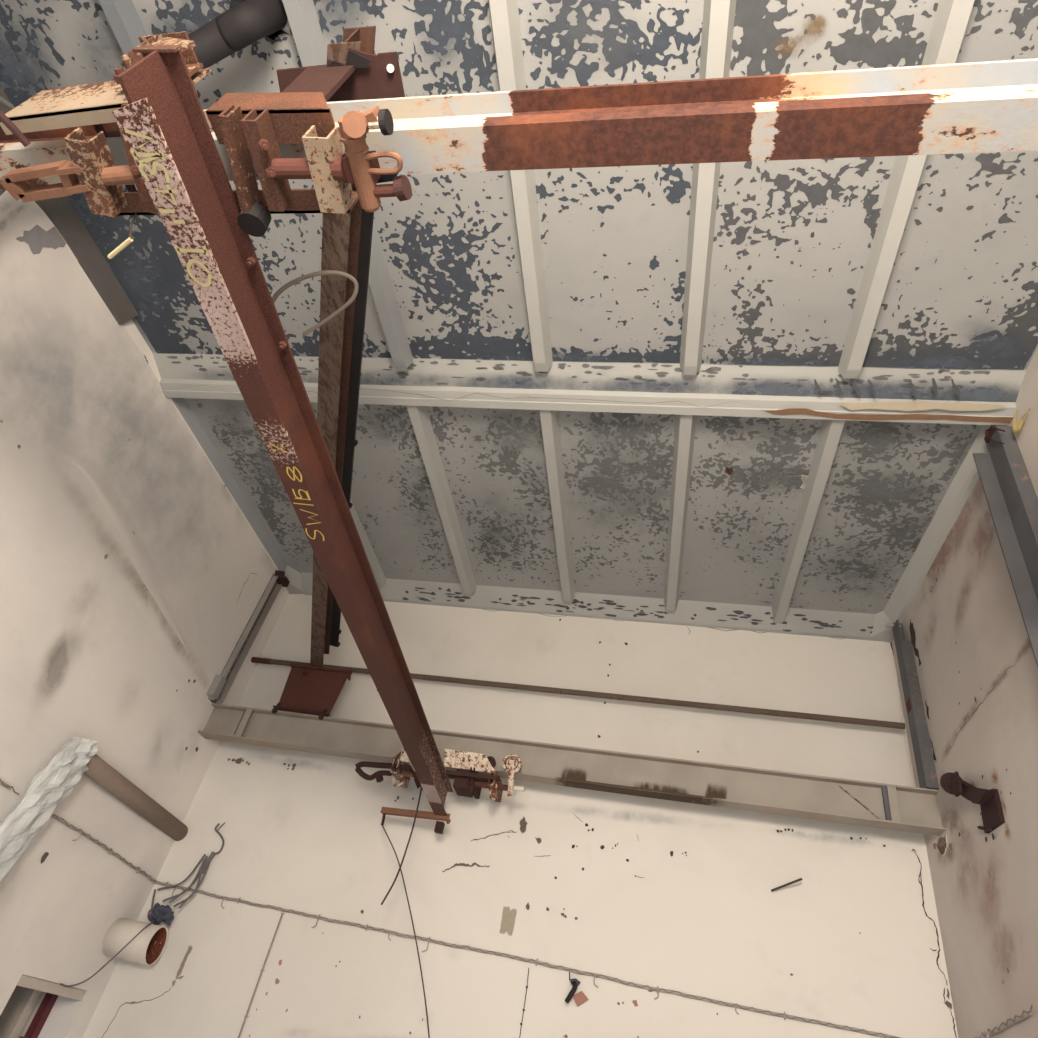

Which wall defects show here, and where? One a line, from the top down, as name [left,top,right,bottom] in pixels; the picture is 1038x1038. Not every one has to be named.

peeling [0,0,107,107]
peeling [141,0,239,35]
peeling [230,28,302,84]
peeling [313,0,498,96]
peeling [518,0,703,89]
peeling [730,0,938,76]
peeling [966,0,1038,59]
flaking render [16,200,78,261]
peeling [85,214,226,376]
peeling [250,213,322,375]
peeling [352,152,1038,632]
crack [442,830,516,872]